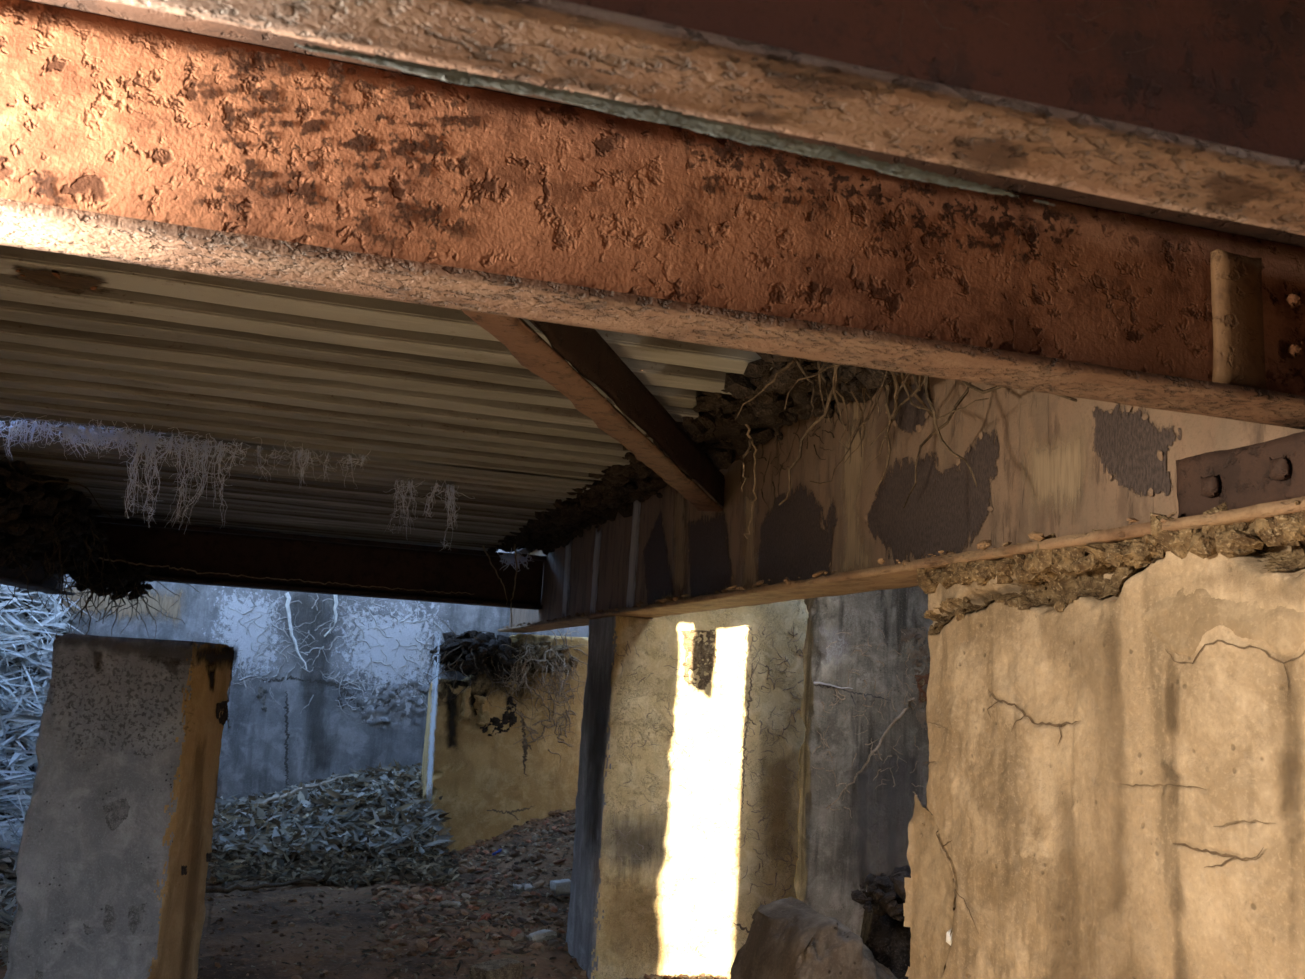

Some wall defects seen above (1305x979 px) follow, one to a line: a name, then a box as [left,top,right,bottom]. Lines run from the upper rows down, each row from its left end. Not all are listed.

rust [190,49,480,250]
rust [6,170,64,206]
rust [686,131,1087,261]
spalling [1249,544,1305,572]
spalling [480,696,517,736]
crack [987,689,1078,744]
crack [1172,819,1276,867]